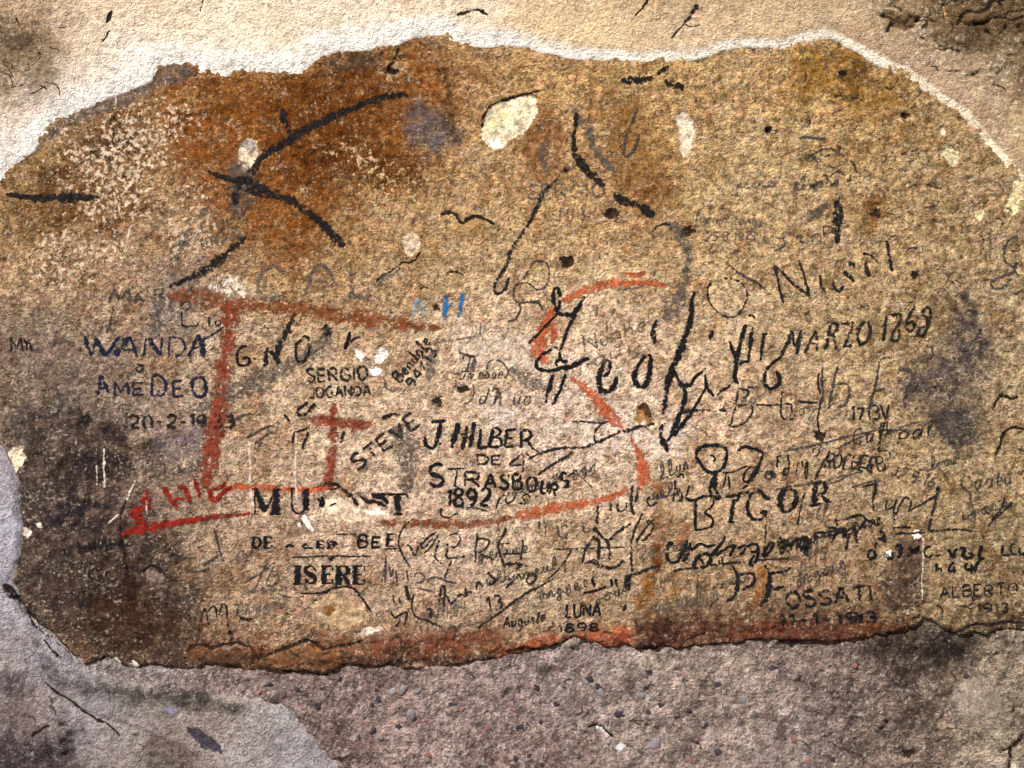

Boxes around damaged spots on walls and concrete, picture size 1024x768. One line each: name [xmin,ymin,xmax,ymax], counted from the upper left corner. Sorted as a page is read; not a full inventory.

water stain [2,49,450,305]
water stain [902,292,995,447]
spalling [8,445,27,472]
spalling [186,727,222,754]
spalling [596,724,625,751]